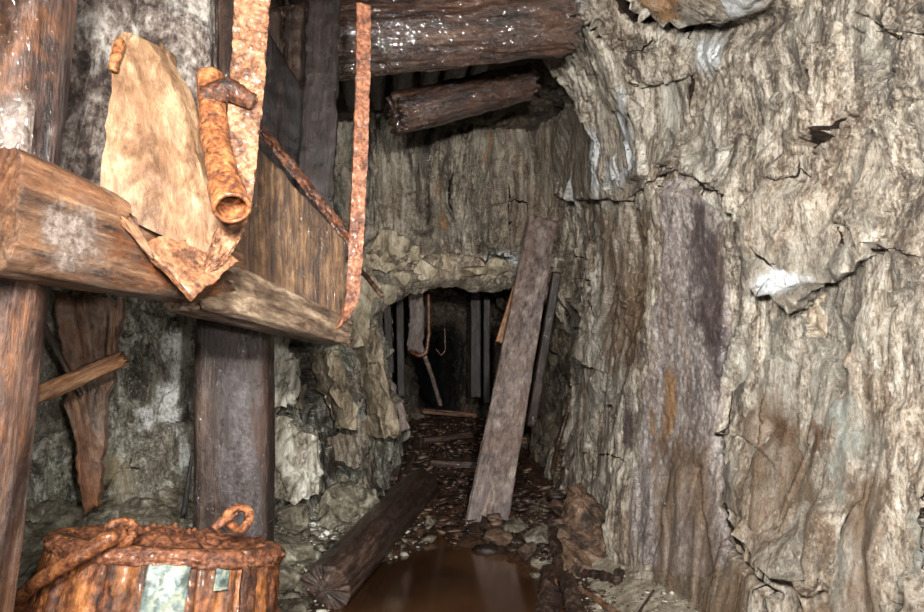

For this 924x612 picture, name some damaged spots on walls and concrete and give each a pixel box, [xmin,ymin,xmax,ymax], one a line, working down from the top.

rust [147,263,175,286]
damp [690,202,728,388]
crack [749,246,775,270]
crack [860,247,905,267]
crack [719,391,733,449]
crack [721,491,751,555]